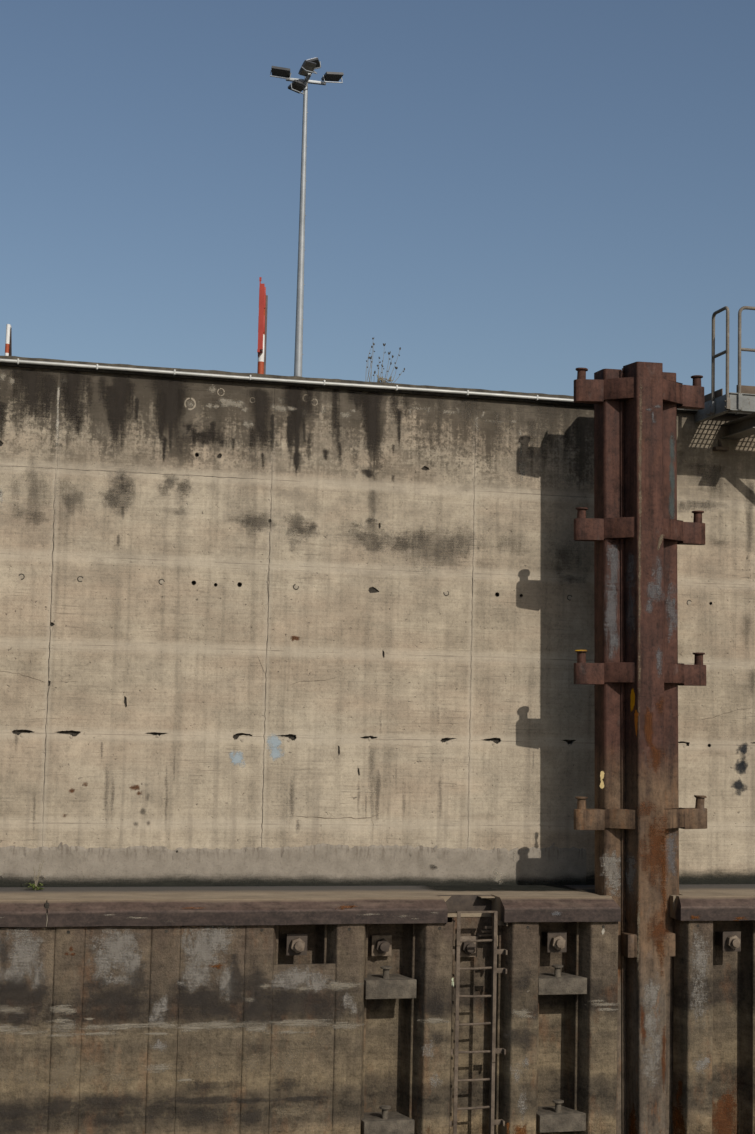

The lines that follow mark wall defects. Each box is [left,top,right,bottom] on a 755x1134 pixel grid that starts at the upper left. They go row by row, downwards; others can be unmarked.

damp [14,369,139,441]
damp [152,377,235,460]
damp [250,386,407,470]
rust [640,803,668,973]